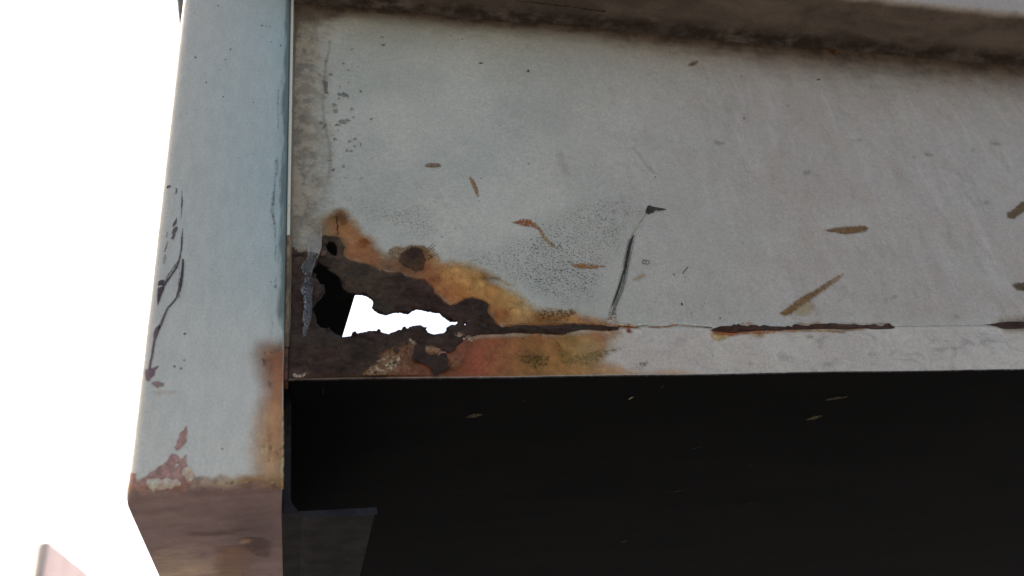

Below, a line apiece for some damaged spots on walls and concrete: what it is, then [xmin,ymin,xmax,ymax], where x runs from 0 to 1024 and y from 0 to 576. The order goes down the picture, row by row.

corrosion [827,225,868,234]
corrosion [256,209,632,489]
corrosion [711,274,894,340]
corrosion [983,321,1024,329]
peeling [129,426,195,492]